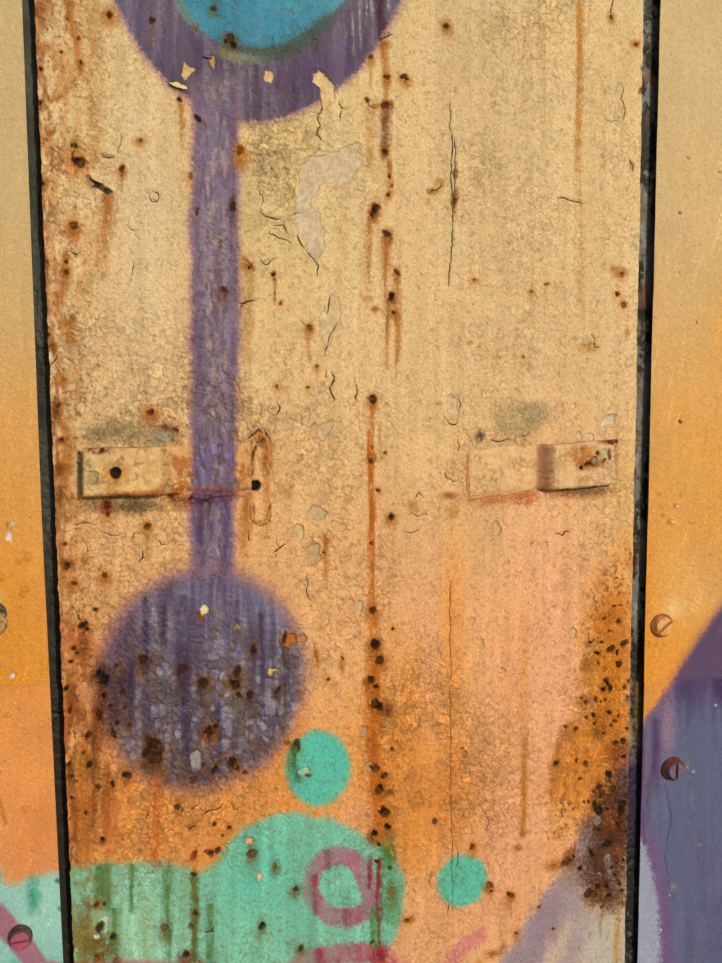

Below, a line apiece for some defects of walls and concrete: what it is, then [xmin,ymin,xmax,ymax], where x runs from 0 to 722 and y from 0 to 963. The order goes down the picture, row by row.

rust [365,0,412,198]
peeling [294,142,363,265]
crack [448,105,456,287]
rust [364,205,400,363]
rust [100,429,271,543]
rust [64,630,130,859]
peeling [190,750,202,769]
peeling [196,605,209,622]
spalling [197,678,208,694]
peeling [281,633,307,646]
rust [363,395,414,950]
rust [546,594,629,927]